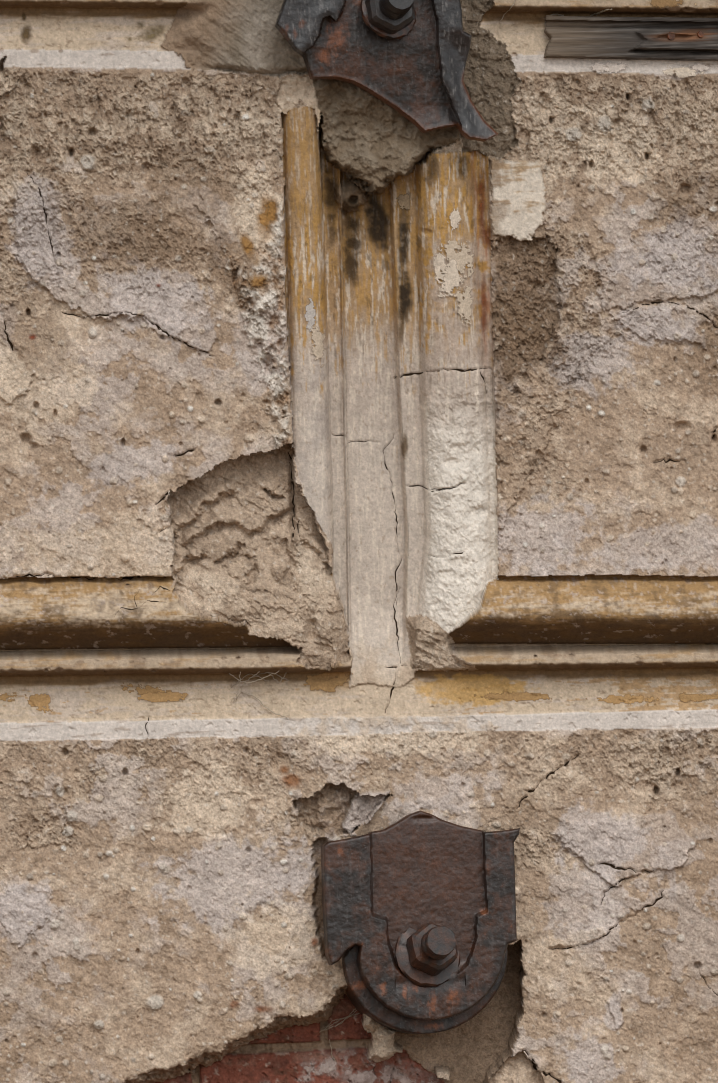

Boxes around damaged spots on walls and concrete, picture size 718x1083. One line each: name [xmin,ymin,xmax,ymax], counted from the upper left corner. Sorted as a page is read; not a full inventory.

flaking render [460,0,561,395]
crack [622,302,718,328]
crack [394,368,487,394]
flaking render [167,443,353,692]
crack [332,434,462,713]
peeling [0,692,52,713]
peeling [121,683,188,702]
flaking render [294,783,393,839]
crack [548,862,665,949]
flaking render [126,940,526,1083]